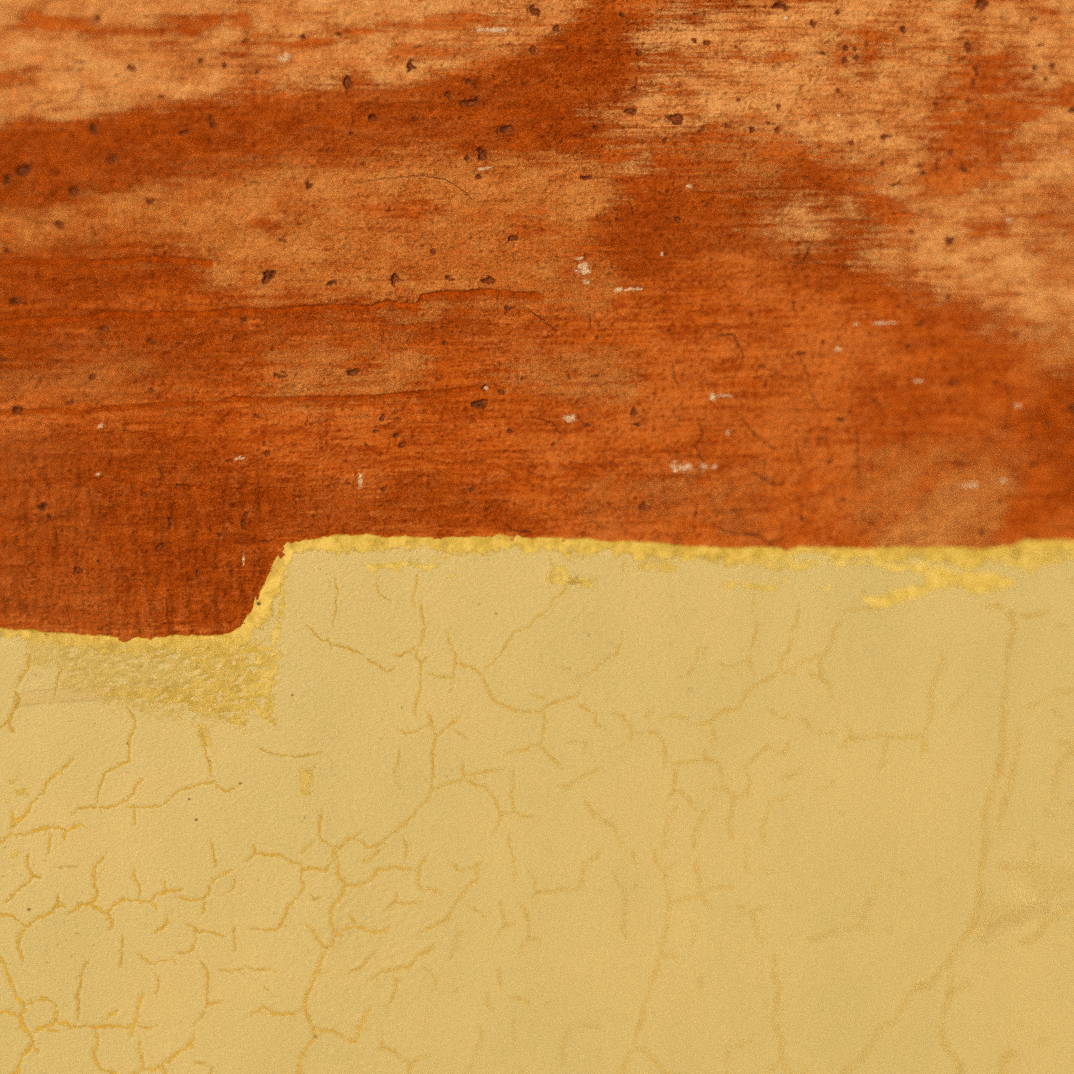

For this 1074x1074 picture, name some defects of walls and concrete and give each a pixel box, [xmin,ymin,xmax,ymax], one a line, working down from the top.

spalling [958,42,979,86]
spalling [367,91,480,123]
spalling [668,114,684,125]
spalling [464,148,487,164]
spalling [4,164,31,185]
spalling [0,242,213,269]
spalling [262,270,277,284]
spalling [0,275,543,331]
spalling [0,384,505,418]
spalling [364,415,516,474]
crack [0,554,944,1074]
crack [842,603,1049,1074]